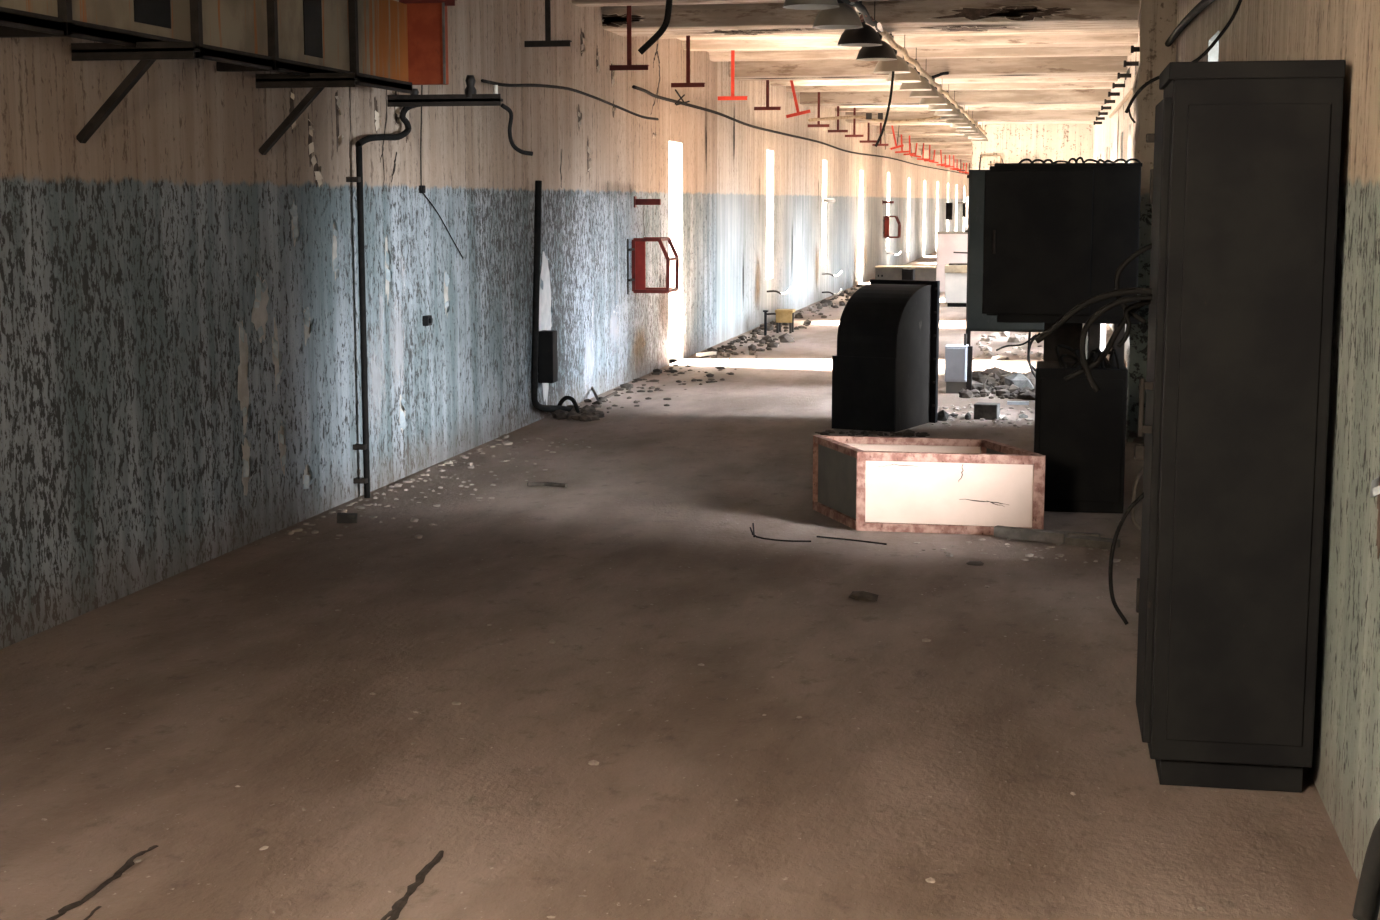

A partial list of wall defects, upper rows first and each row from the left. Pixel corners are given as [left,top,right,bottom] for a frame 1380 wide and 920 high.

crack [46,845,158,920]
crack [380,850,444,920]